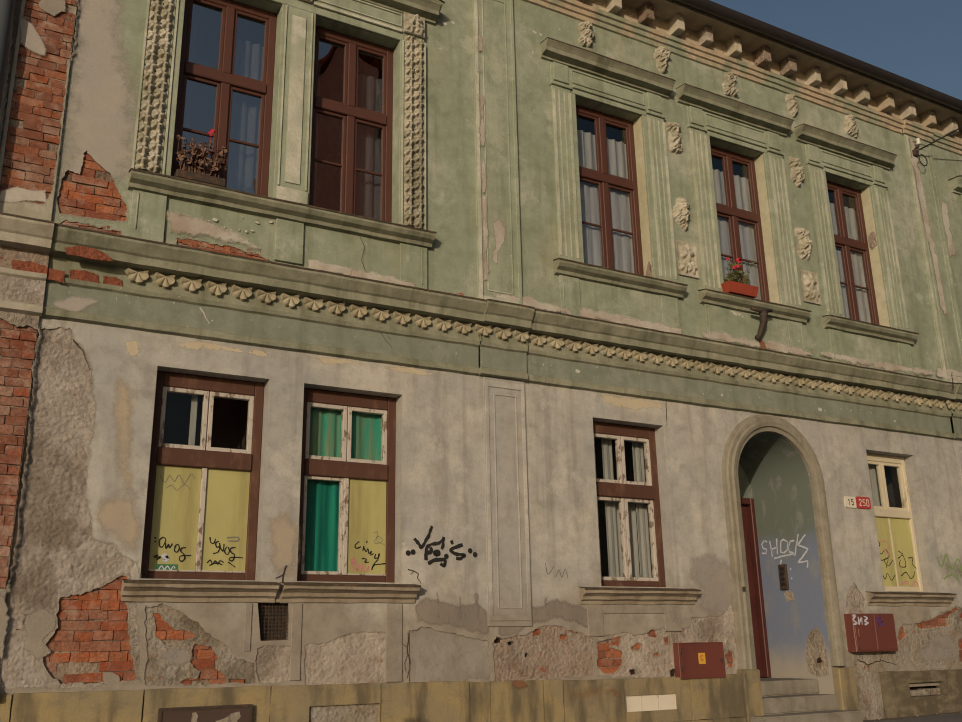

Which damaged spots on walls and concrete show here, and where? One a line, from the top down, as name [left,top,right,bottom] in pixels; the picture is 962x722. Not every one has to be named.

flaking render [0,0,136,235]
flaking render [12,246,123,287]
peeling [164,210,273,261]
peeling [54,296,97,312]
peeling [600,395,663,410]
flaking render [0,317,515,690]
flaking render [560,605,741,678]
flaking render [850,606,962,672]